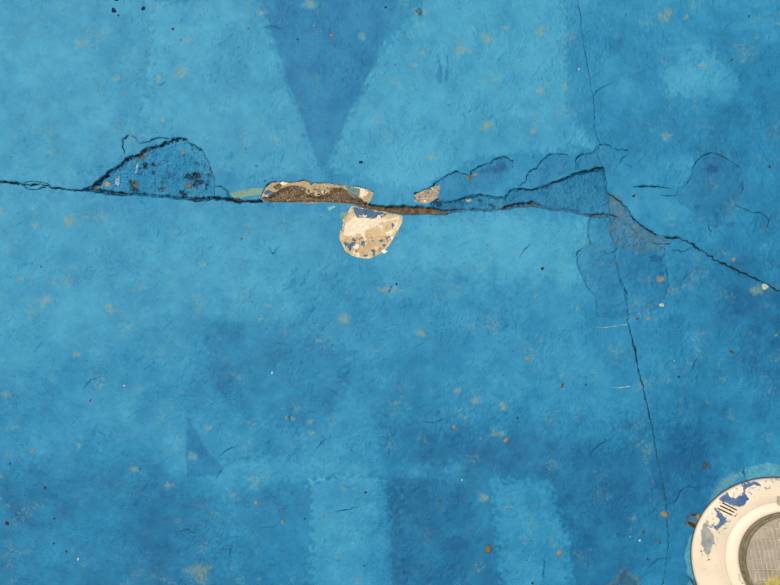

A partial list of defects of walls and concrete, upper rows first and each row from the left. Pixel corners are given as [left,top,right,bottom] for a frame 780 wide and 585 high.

crack [0,181,263,204]
flaking render [85,135,403,258]
peeling [414,143,671,319]
crack [359,0,779,584]